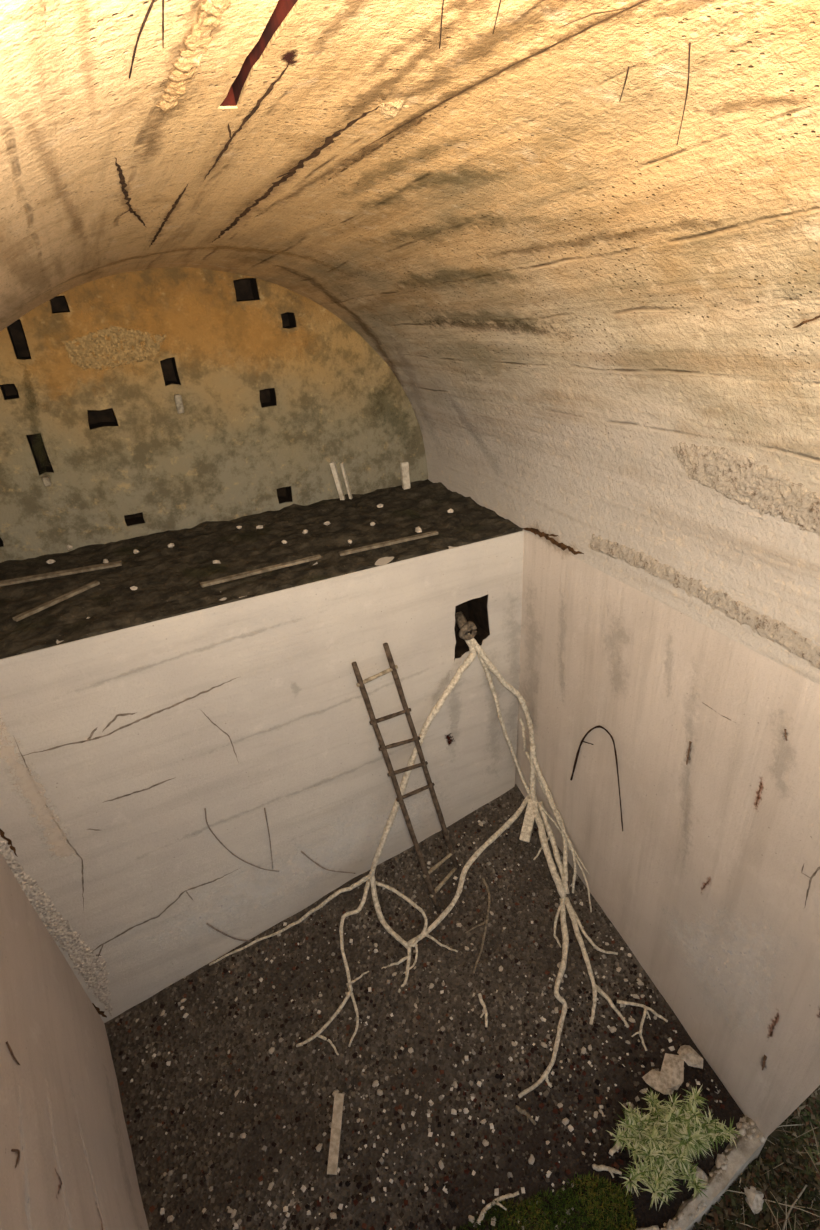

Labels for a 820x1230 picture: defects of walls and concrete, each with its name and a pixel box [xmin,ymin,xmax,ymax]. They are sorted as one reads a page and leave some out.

crack [212,0,649,243]
spalling [671,442,820,537]
crack [523,528,584,555]
spalling [588,534,820,670]
crack [14,677,239,911]
crack [0,829,18,857]
crack [83,868,240,957]
crack [801,864,820,908]
crack [92,1003,107,1018]